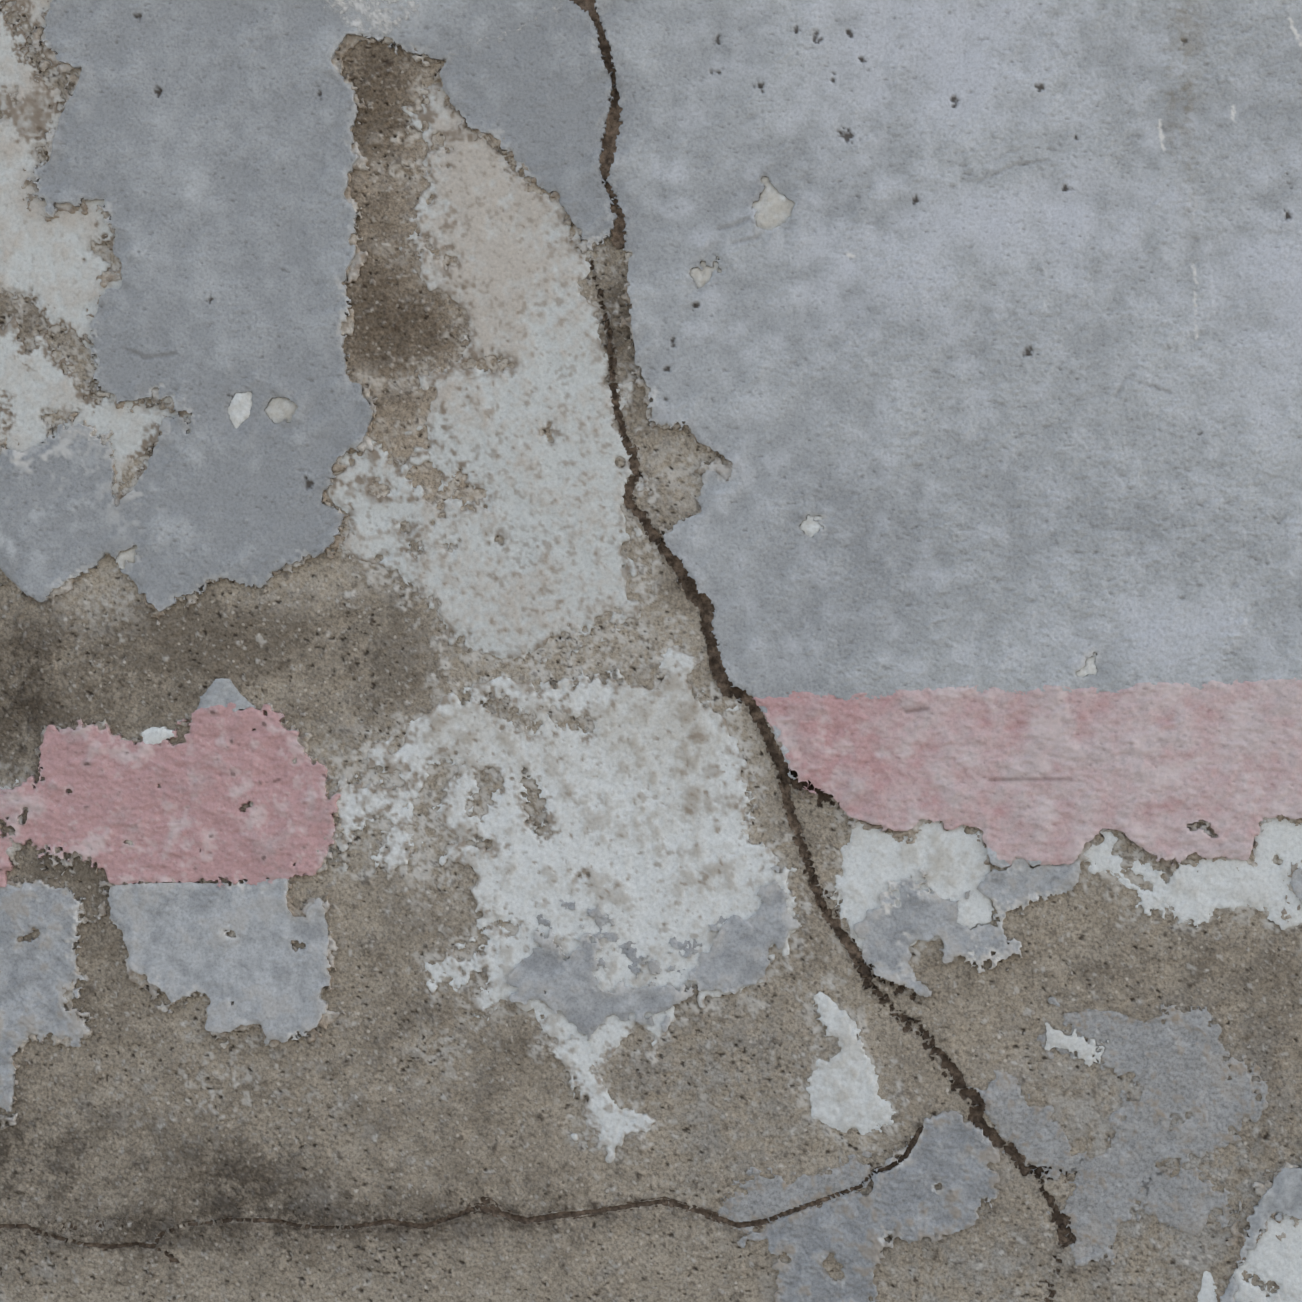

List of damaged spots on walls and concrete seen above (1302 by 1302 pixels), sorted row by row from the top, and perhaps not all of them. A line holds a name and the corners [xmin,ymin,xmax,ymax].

peeling [0,0,192,498]
crack [0,1126,924,1264]
peeling [323,40,727,659]
spalling [0,503,1302,1302]
crack [570,0,1077,1302]